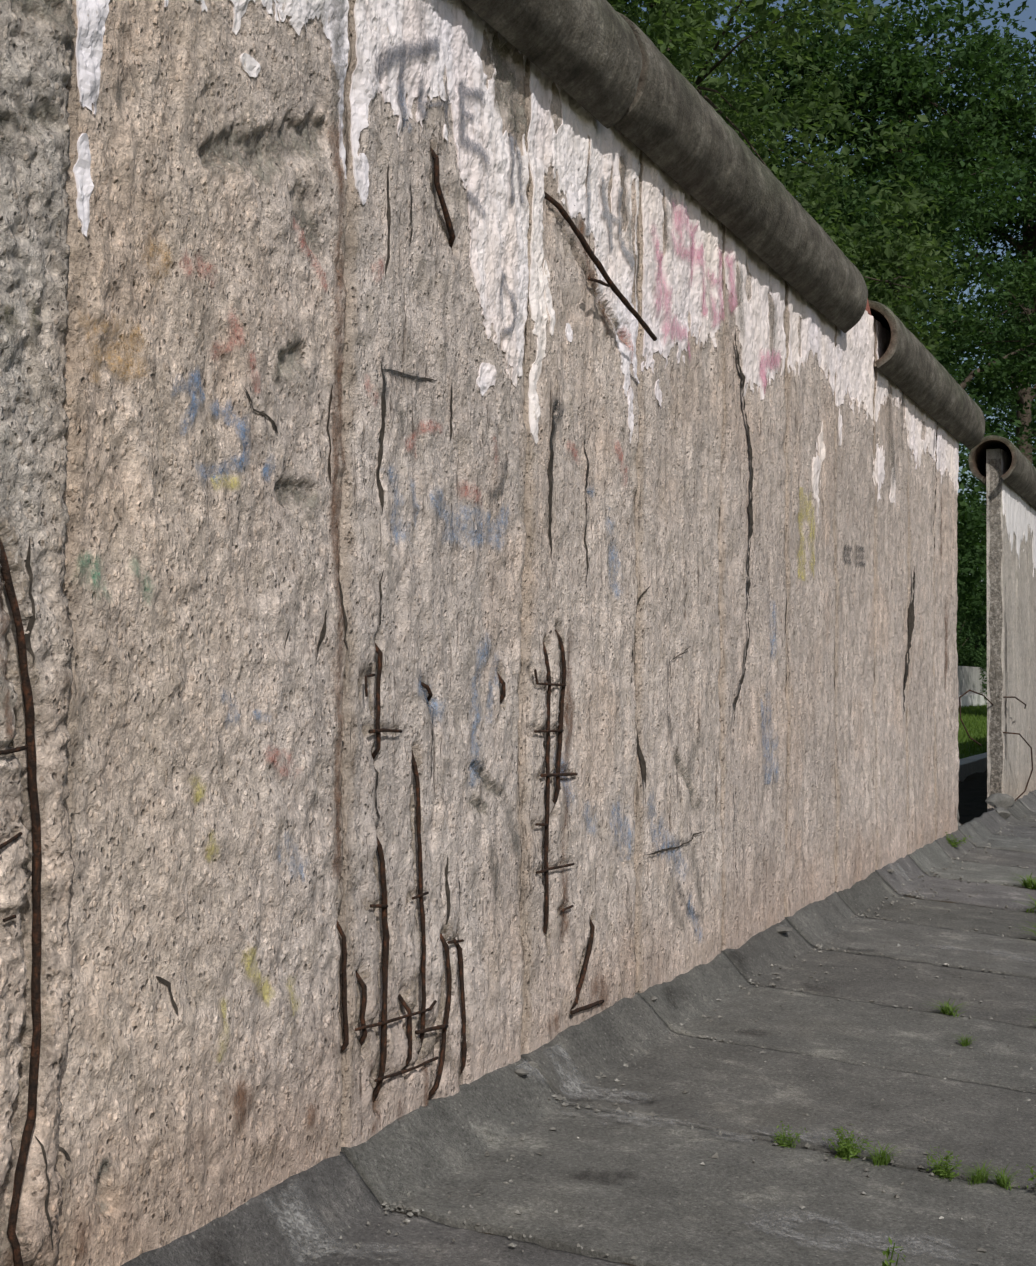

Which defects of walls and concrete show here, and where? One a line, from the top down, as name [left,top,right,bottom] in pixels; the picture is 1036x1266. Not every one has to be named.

peeling [20,0,110,115]
peeling [73,133,94,237]
spalling [200,122,320,182]
rust [332,130,343,205]
peeling [228,0,959,524]
rust [332,232,344,594]
crack [733,330,754,751]
crack [783,598,791,678]
crack [903,423,938,715]
spalling [988,449,1036,795]
spalling [0,520,53,1266]
rust [335,695,343,874]